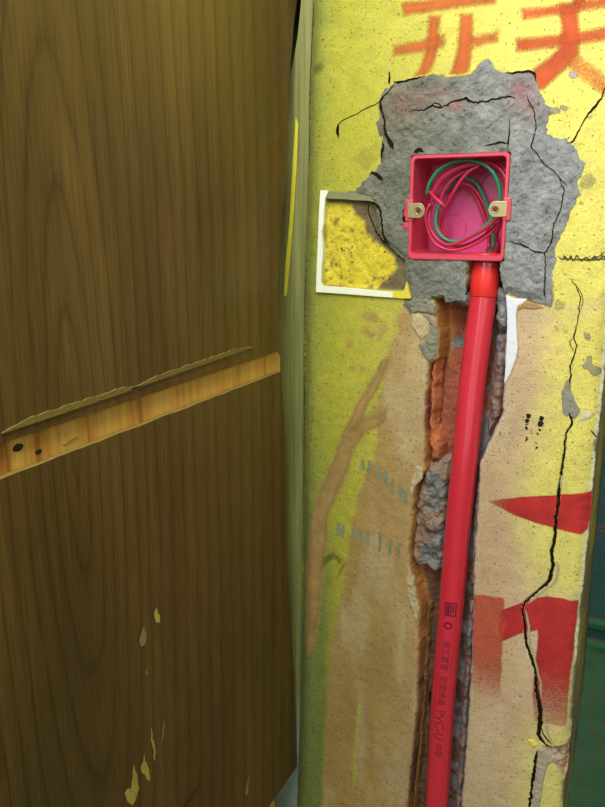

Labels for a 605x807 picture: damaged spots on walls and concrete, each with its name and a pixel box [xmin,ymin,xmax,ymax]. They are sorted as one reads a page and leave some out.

crack [336,71,424,182]
crack [567,87,605,144]
crack [410,70,567,298]
crack [368,201,390,244]
flaking render [408,297,438,362]
crack [569,278,584,389]
flaking render [409,466,423,495]
flaking render [405,567,420,624]
crack [521,414,573,807]